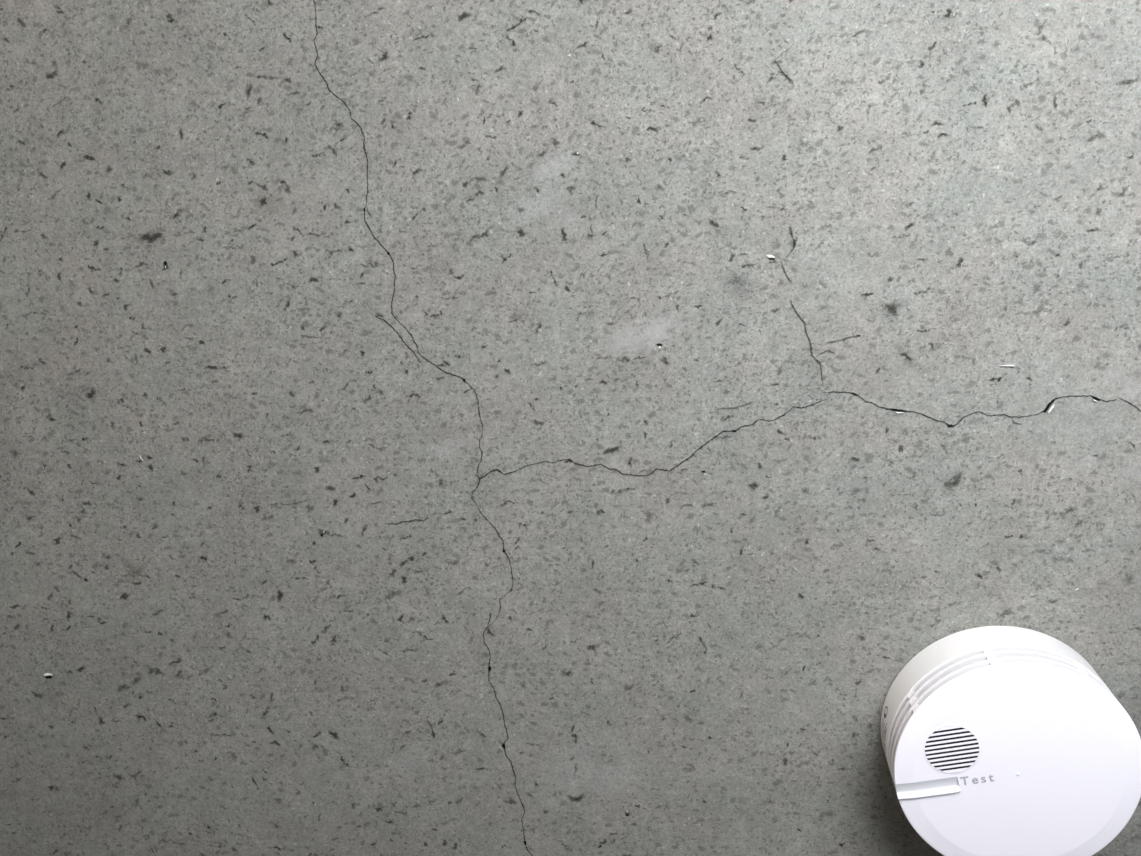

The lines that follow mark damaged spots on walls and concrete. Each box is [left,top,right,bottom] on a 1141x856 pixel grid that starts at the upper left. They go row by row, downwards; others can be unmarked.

crack [312,0,1141,856]